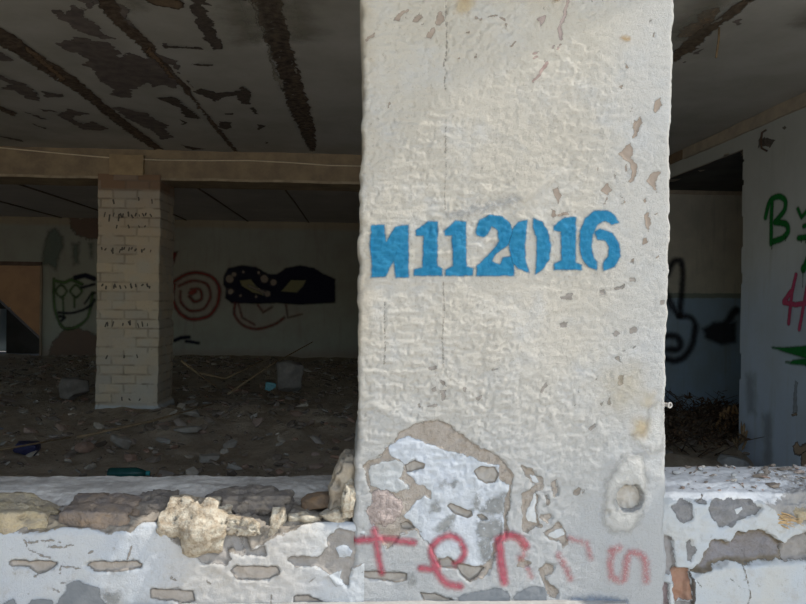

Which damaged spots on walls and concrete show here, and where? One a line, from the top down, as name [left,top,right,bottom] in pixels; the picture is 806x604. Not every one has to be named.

peeling [394,9,445,39]
peeling [51,0,257,140]
peeling [0,75,108,131]
spalling [363,420,514,582]
spalling [521,465,568,547]
spalling [9,539,142,593]
spalling [150,577,195,604]
spalling [197,535,280,580]
spalling [288,528,407,587]
spalling [421,593,451,601]
spalling [517,558,559,598]
spalling [662,498,806,604]